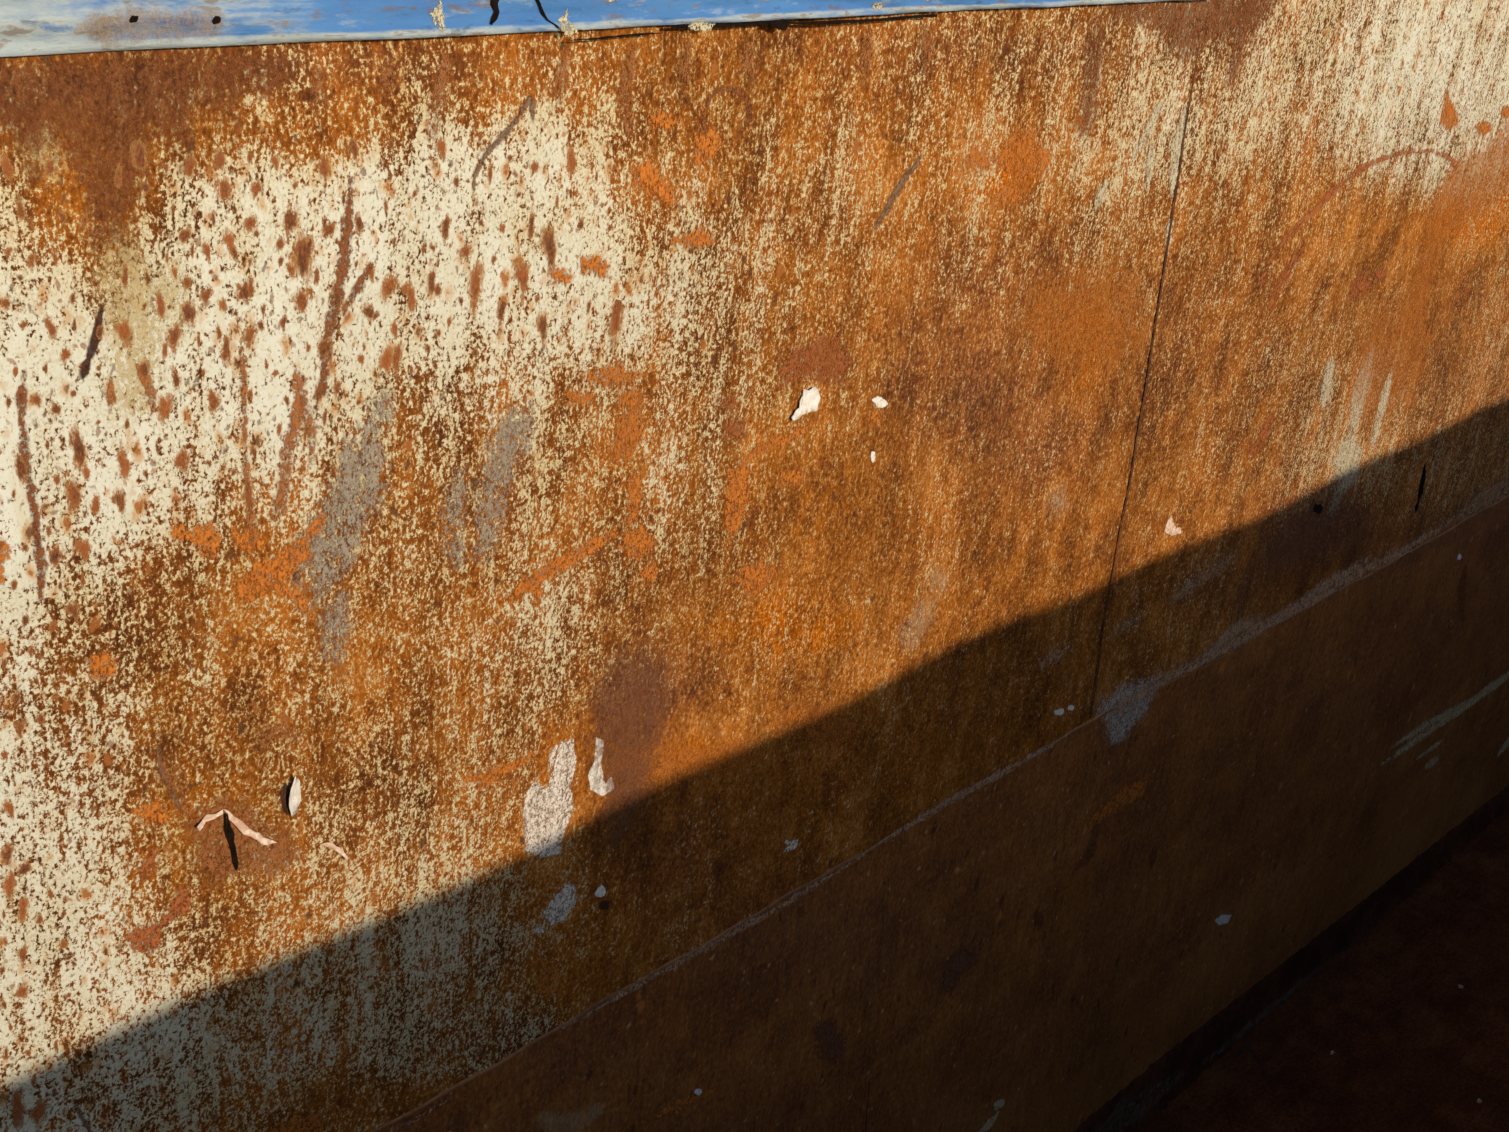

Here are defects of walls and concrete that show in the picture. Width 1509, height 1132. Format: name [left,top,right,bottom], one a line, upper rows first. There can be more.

rust [1073,0,1280,140]
rust [80,306,104,379]
rust [170,176,373,621]
spalling [114,139,564,421]
rust [550,256,611,285]
peeling [792,387,821,422]
rust [16,371,49,601]
spalling [54,419,148,518]
spalling [1,800,44,925]
rust [133,752,302,885]
peeling [289,776,301,817]
peeling [523,738,613,858]